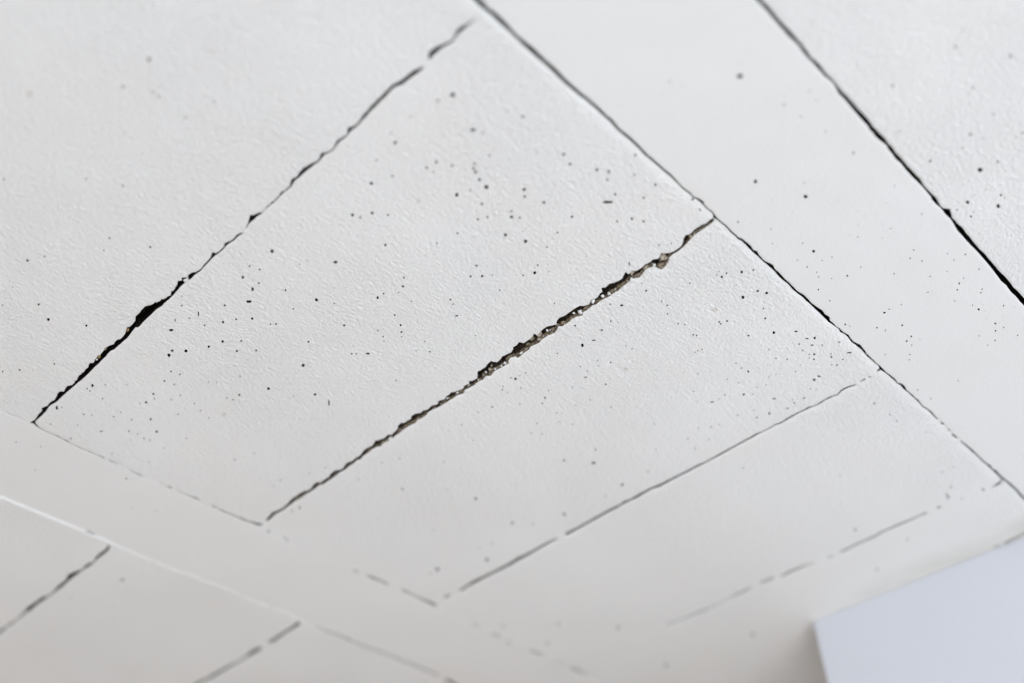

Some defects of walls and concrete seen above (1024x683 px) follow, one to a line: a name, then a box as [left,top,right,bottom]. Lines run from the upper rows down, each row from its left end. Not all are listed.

crack [30,19,476,477]
crack [161,0,1024,606]